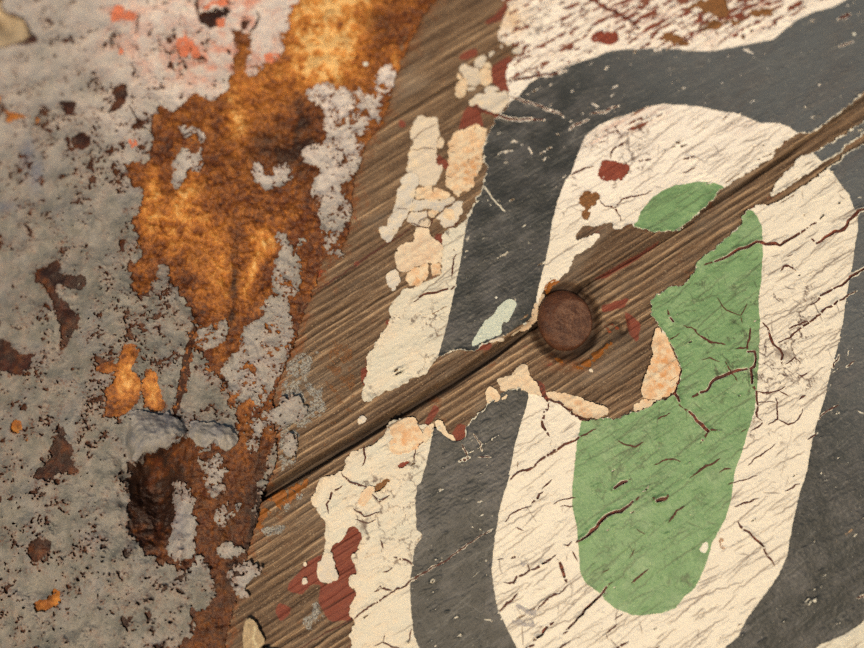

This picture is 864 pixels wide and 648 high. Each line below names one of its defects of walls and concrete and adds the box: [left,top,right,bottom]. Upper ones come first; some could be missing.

peeling [455,41,523,114]
peeling [379,115,487,291]
crack [414,255,456,302]
crack [704,208,864,271]
rust [96,0,437,648]
peeling [389,417,456,469]
peeling [485,364,609,419]
peeling [633,328,681,412]
crack [655,268,864,566]
crack [301,380,596,648]
peeling [318,553,339,583]
crack [498,479,685,648]